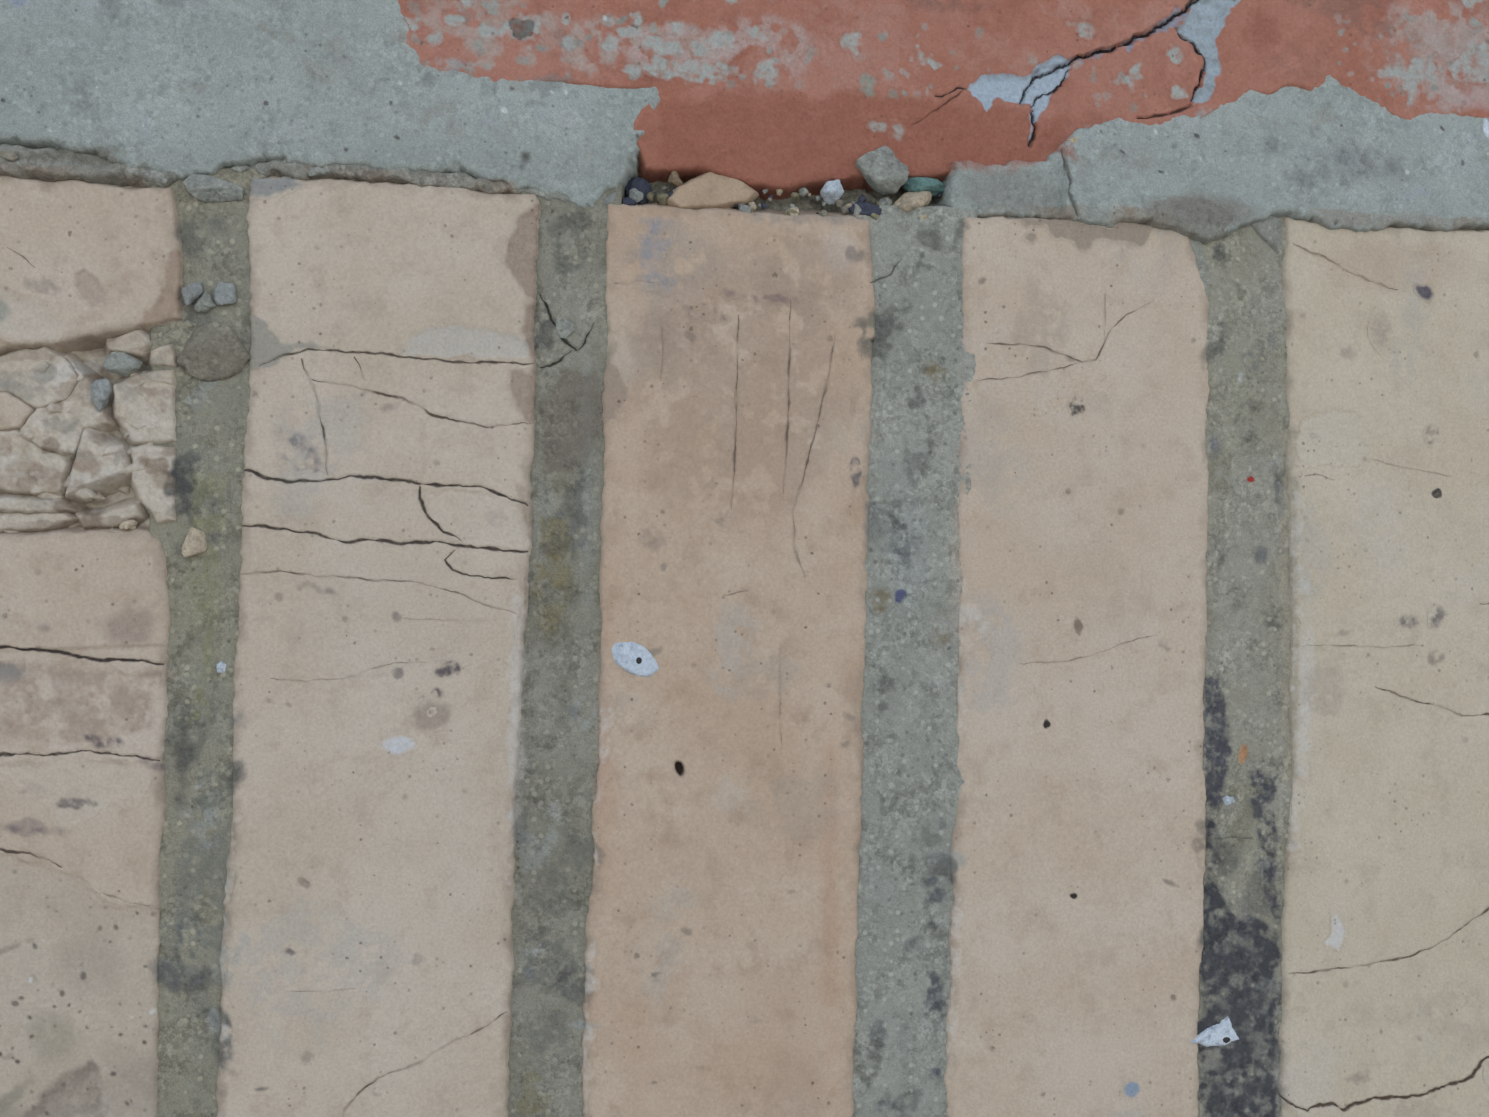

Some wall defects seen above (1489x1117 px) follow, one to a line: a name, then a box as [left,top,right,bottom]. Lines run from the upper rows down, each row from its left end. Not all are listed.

peeling [405,0,579,62]
peeling [601,9,798,87]
peeling [839,30,908,143]
crack [1019,0,1206,216]
peeling [1107,60,1146,90]
peeling [1169,83,1190,102]
peeling [1373,41,1489,109]
crack [241,294,594,621]
crack [0,645,164,666]
crack [0,750,160,761]
crack [1290,907,1489,974]
crack [1278,1056,1489,1113]